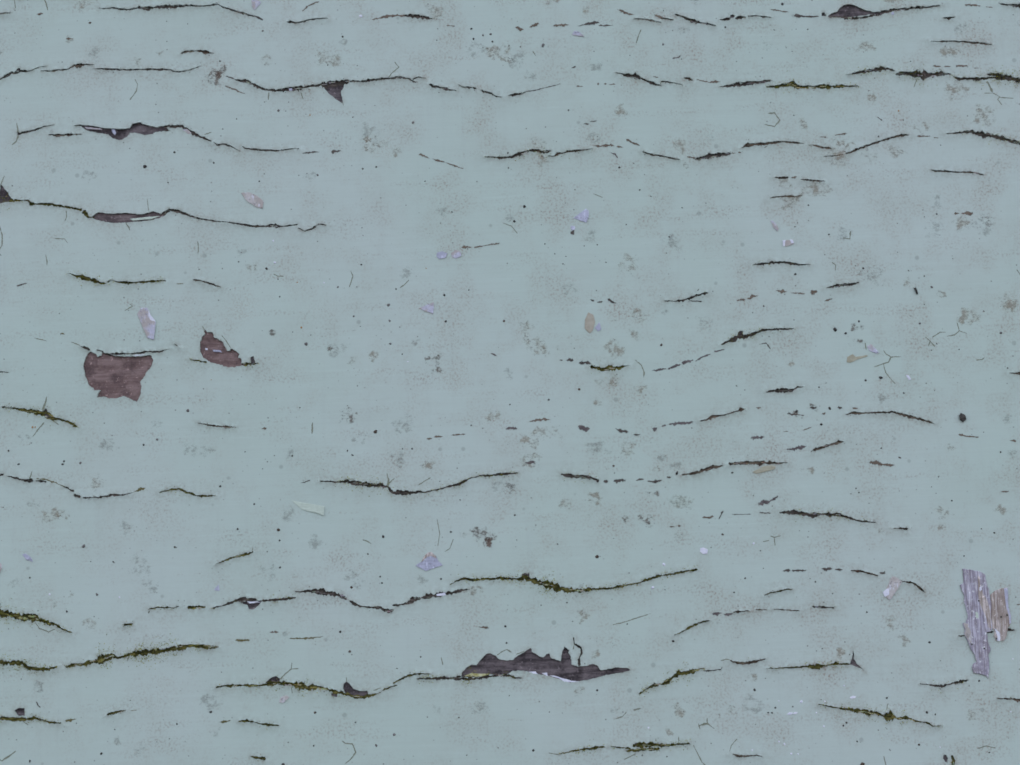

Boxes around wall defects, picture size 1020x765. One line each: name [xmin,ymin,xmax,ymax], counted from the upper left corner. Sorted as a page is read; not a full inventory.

peeling [794,5,938,20]
crack [429,4,1020,198]
peeling [72,308,164,402]
peeling [189,326,258,367]
crack [561,386,934,484]
crack [302,461,535,497]
crack [295,568,698,613]
crack [0,598,72,633]
crack [0,605,323,677]
crack [216,658,443,700]
peeling [417,637,630,687]
crack [0,702,75,725]